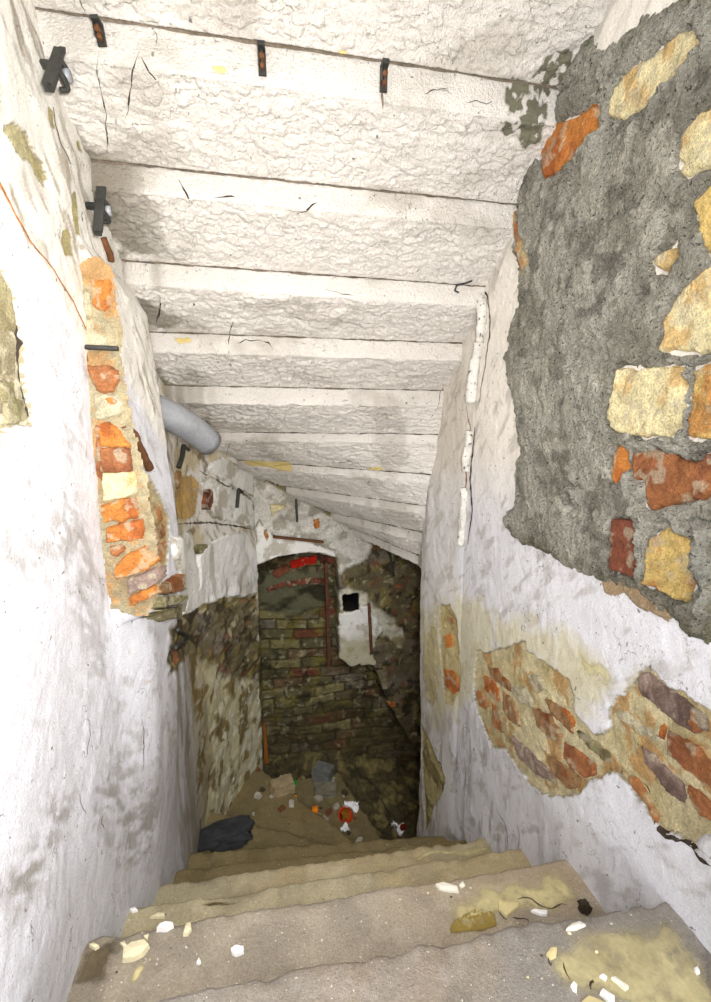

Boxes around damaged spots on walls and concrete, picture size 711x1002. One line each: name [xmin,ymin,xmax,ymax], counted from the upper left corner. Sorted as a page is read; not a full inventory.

crack [97,22,159,153]
flaking render [541,30,699,179]
flaking render [679,109,711,178]
flaking render [513,211,529,275]
flaking render [694,186,711,254]
flaking render [0,273,29,427]
flaking render [61,191,336,622]
flaking render [607,268,711,440]
flaking render [612,445,711,510]
flaking render [609,518,697,602]
flaking render [440,605,461,704]
flaking render [475,642,711,866]